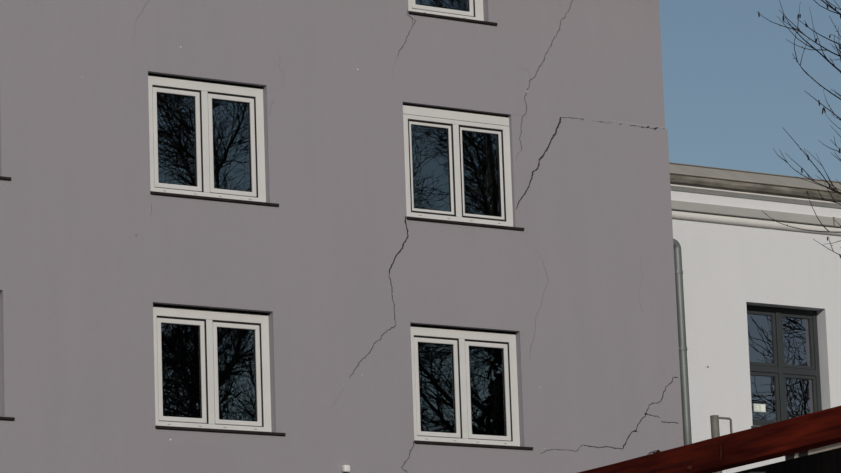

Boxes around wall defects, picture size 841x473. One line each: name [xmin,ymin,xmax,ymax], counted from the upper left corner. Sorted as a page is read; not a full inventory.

crack [516,0,664,209]
crack [349,216,409,378]
crack [540,377,679,454]